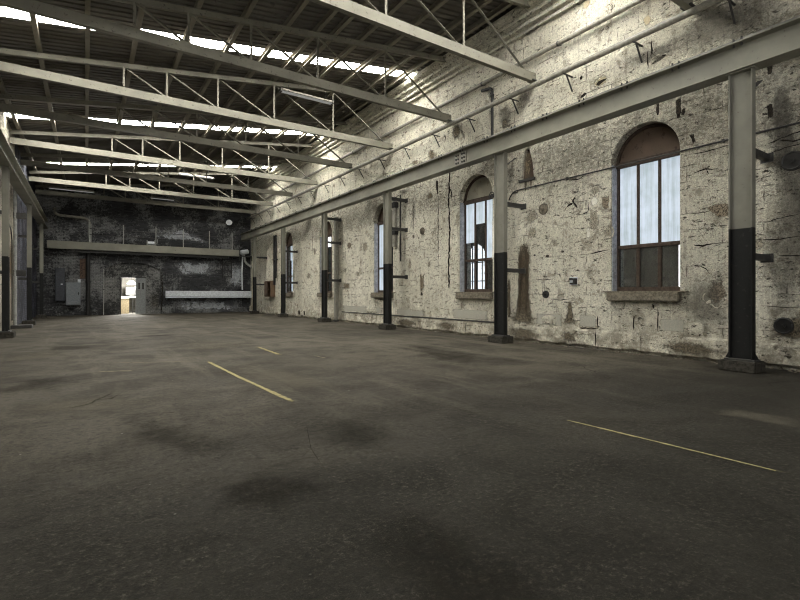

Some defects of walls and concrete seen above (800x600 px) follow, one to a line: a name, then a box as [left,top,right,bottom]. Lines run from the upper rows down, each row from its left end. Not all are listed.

crack [768,131,800,153]
rust [524,156,532,190]
crack [437,173,452,288]
crack [759,214,800,256]
rust [507,245,539,339]